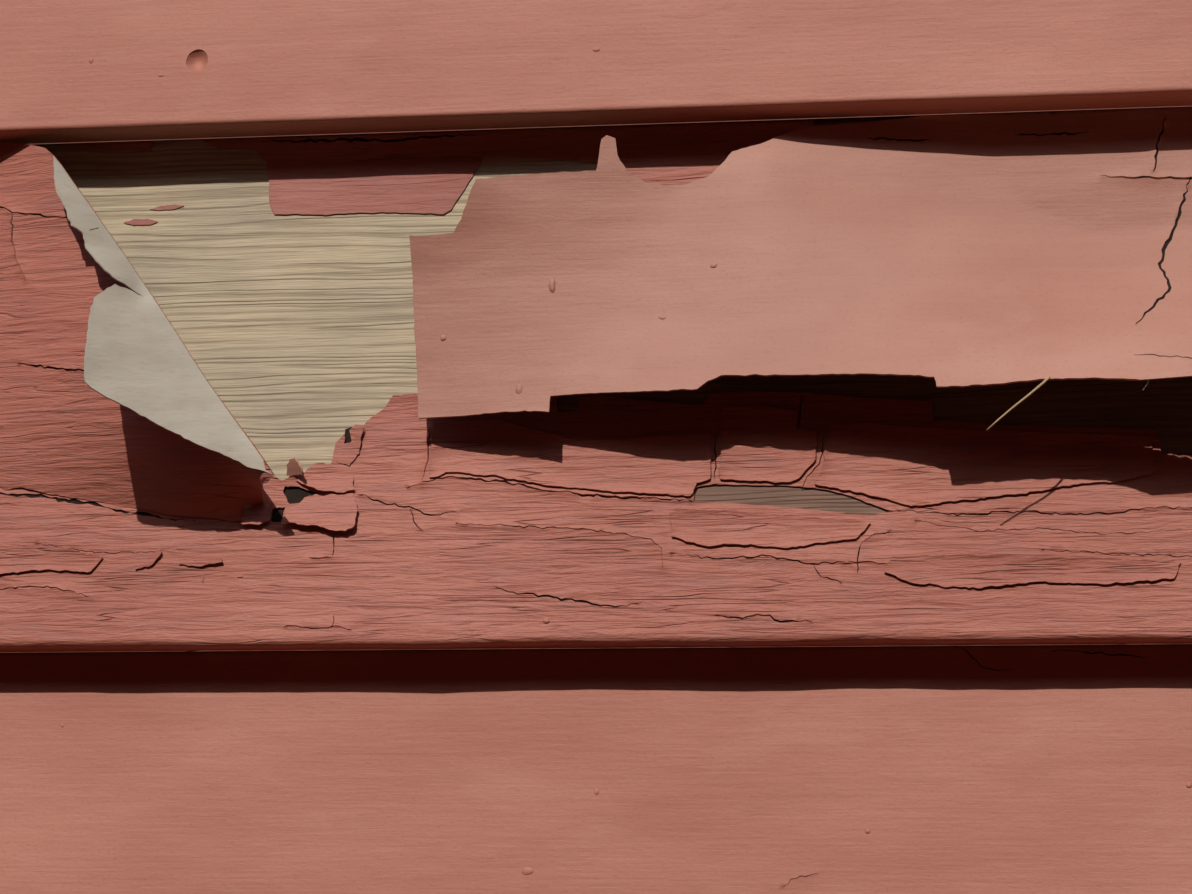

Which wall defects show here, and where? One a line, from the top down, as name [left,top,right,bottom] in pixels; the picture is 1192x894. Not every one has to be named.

crack [0,206,67,244]
crack [1105,117,1192,322]
peeling [0,106,1192,532]
crack [22,363,84,372]
crack [428,451,658,499]
crack [361,494,449,528]
crack [679,508,1191,583]
crack [498,588,637,607]
crack [718,615,811,623]